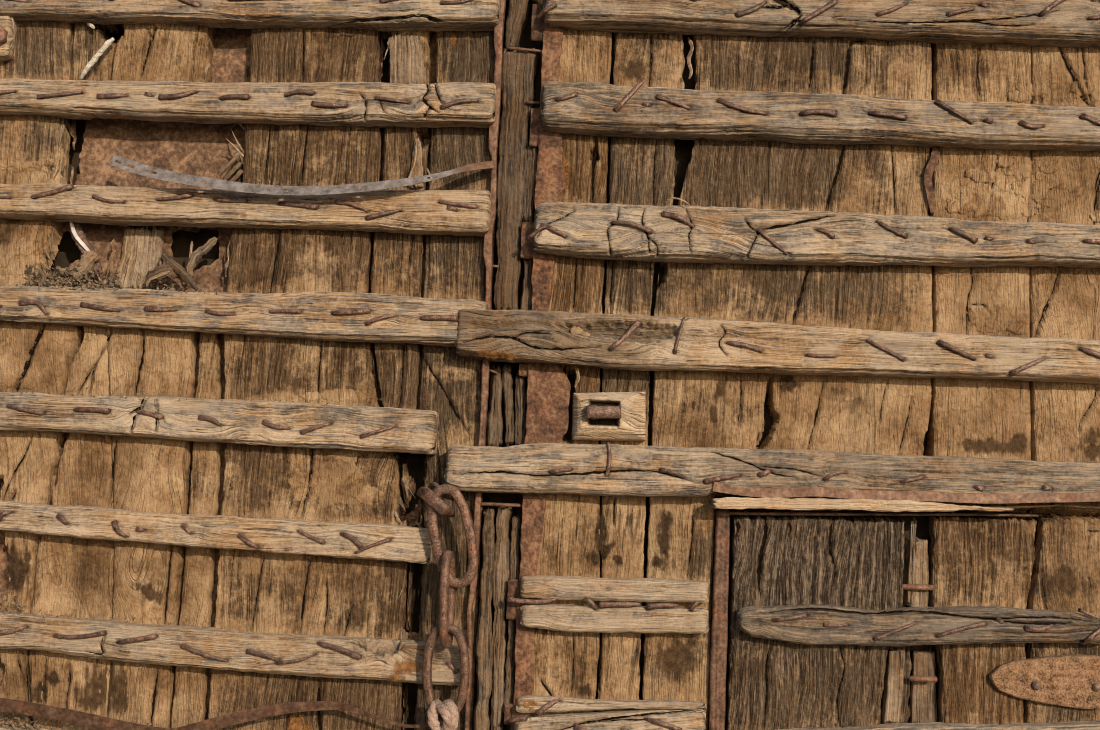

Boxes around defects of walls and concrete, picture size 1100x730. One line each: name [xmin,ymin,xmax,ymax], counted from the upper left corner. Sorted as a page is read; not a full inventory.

crack [763,0,801,33]
crack [807,46,815,88]
crack [843,10,1057,94]
crack [16,327,44,390]
crack [466,331,584,350]
crack [0,441,31,499]
corrosion [388,658,423,681]
corrosion [289,713,309,730]